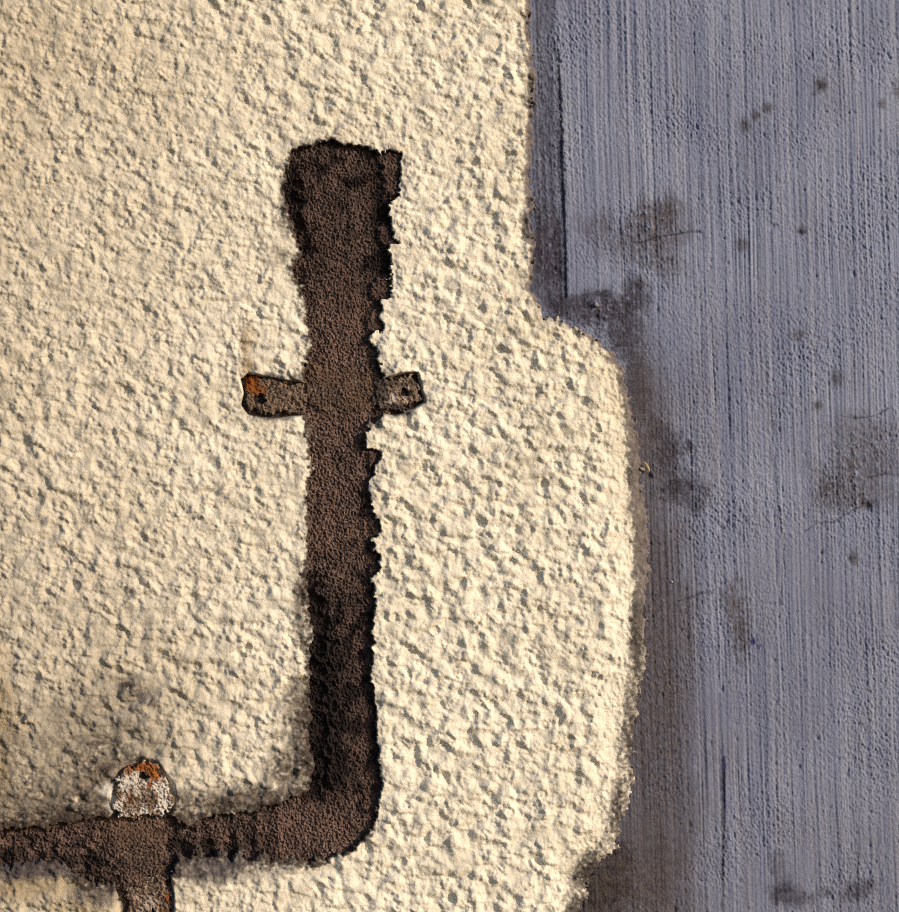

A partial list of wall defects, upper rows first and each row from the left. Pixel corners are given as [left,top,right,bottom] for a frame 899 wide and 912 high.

peeling [521,0,538,304]
corrosion [244,362,263,394]
peeling [574,330,652,857]
corrosion [124,761,162,789]